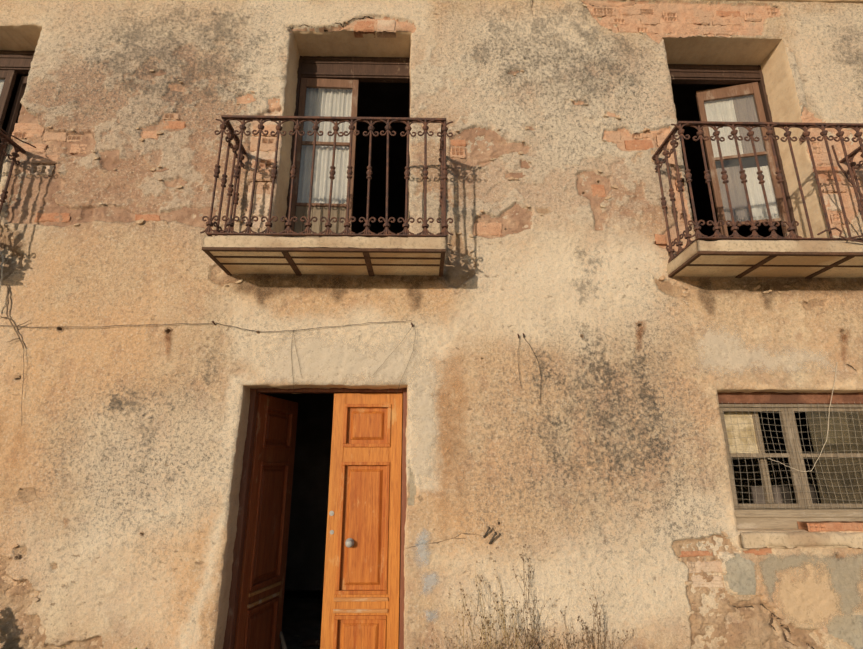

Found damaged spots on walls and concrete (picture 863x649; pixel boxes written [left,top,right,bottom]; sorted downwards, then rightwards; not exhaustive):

flaking render [289,16,416,38]
flaking render [581,0,781,44]
flaking render [449,127,531,181]
flaking render [0,103,217,280]
water stain [238,275,446,306]
flaking render [0,544,103,649]
flaking render [672,531,840,649]
crack [732,603,814,649]